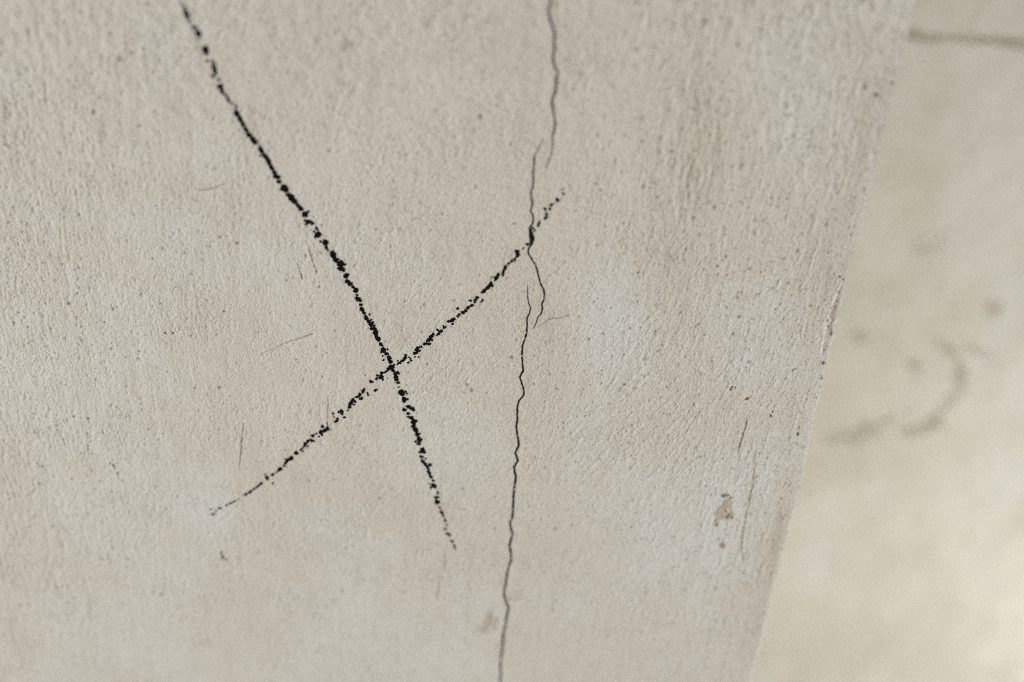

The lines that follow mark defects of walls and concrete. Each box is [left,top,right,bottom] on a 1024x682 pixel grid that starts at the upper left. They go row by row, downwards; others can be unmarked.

crack [499,0,559,682]